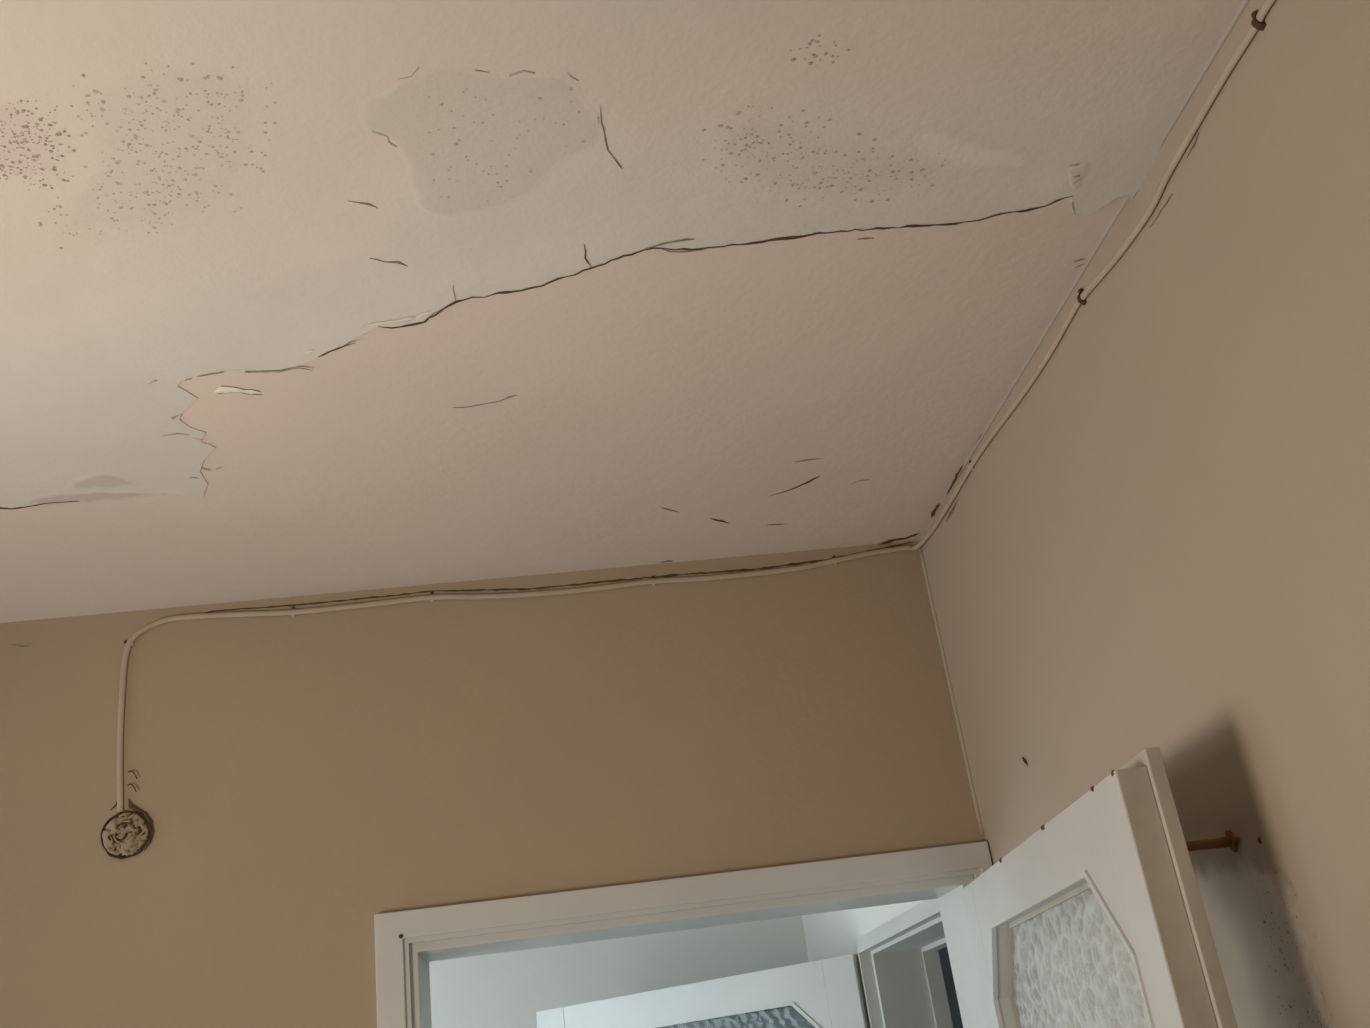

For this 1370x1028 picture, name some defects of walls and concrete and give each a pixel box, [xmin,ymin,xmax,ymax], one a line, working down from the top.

leakage [0,43,286,250]
leakage [358,63,604,218]
peeling [0,0,1244,509]
leakage [689,91,965,214]